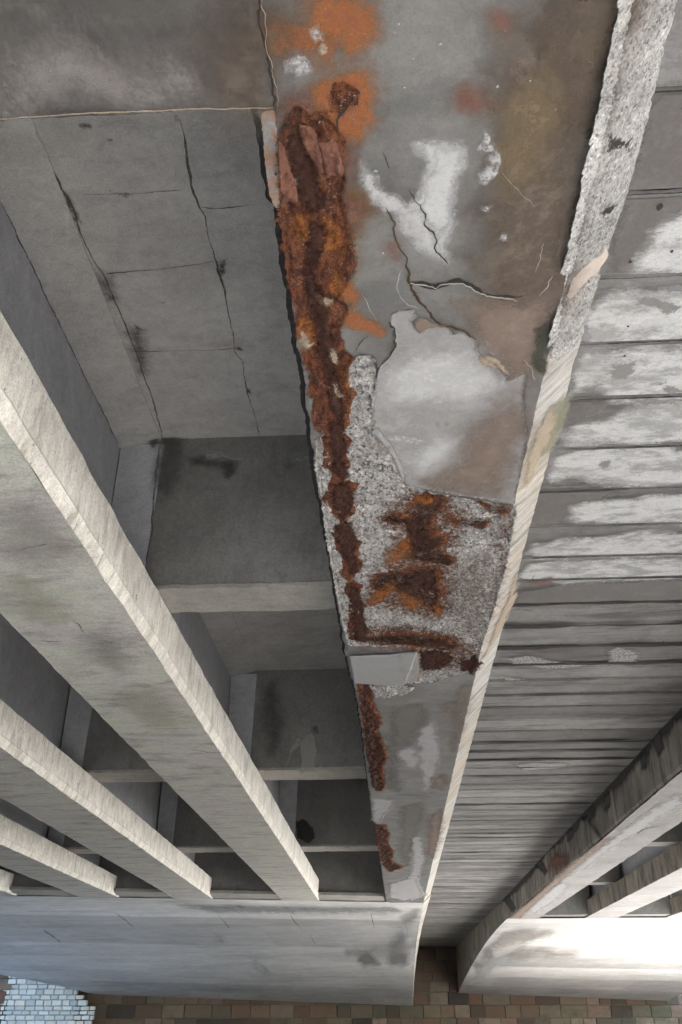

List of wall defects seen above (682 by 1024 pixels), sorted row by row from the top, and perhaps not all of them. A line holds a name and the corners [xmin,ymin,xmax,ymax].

crack [0,201,118,443]
crack [36,117,260,563]
corrosion [268,0,379,63]
corrosion [279,68,378,224]
spalling [273,107,529,791]
water stain [360,140,466,259]
crack [355,190,554,388]
spalling [547,0,678,361]